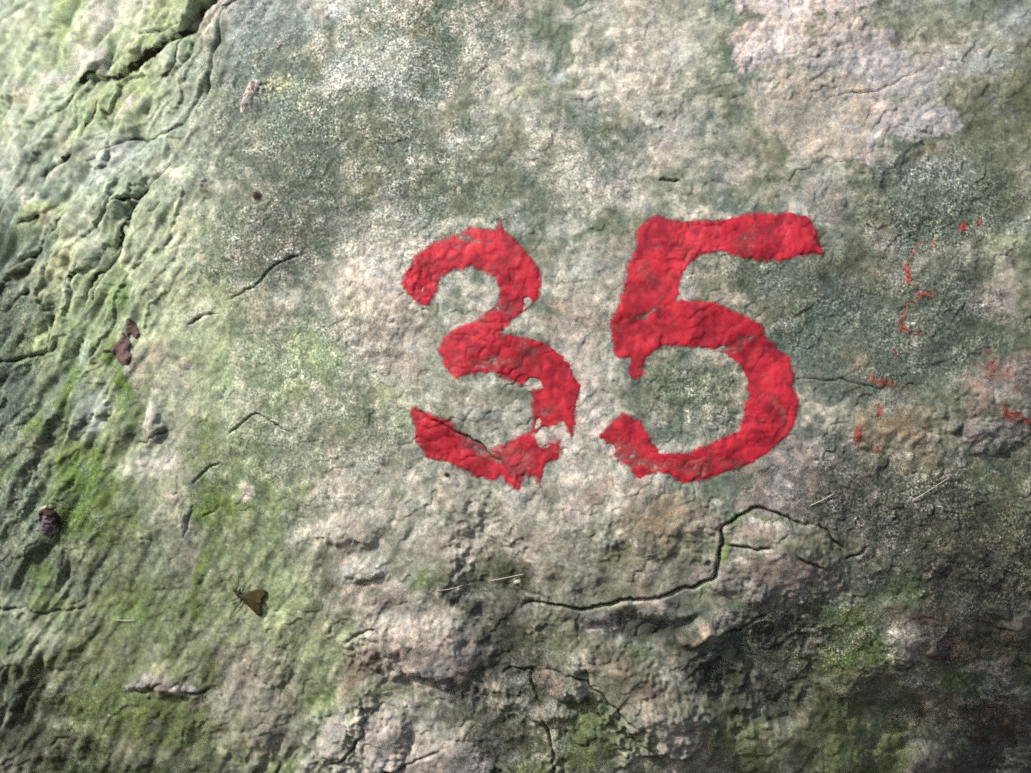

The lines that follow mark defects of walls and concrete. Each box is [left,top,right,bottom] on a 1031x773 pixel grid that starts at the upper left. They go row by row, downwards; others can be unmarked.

crack [41,0,236,177]
spalling [843,387,912,450]
spalling [959,351,1031,452]
crack [523,506,867,609]